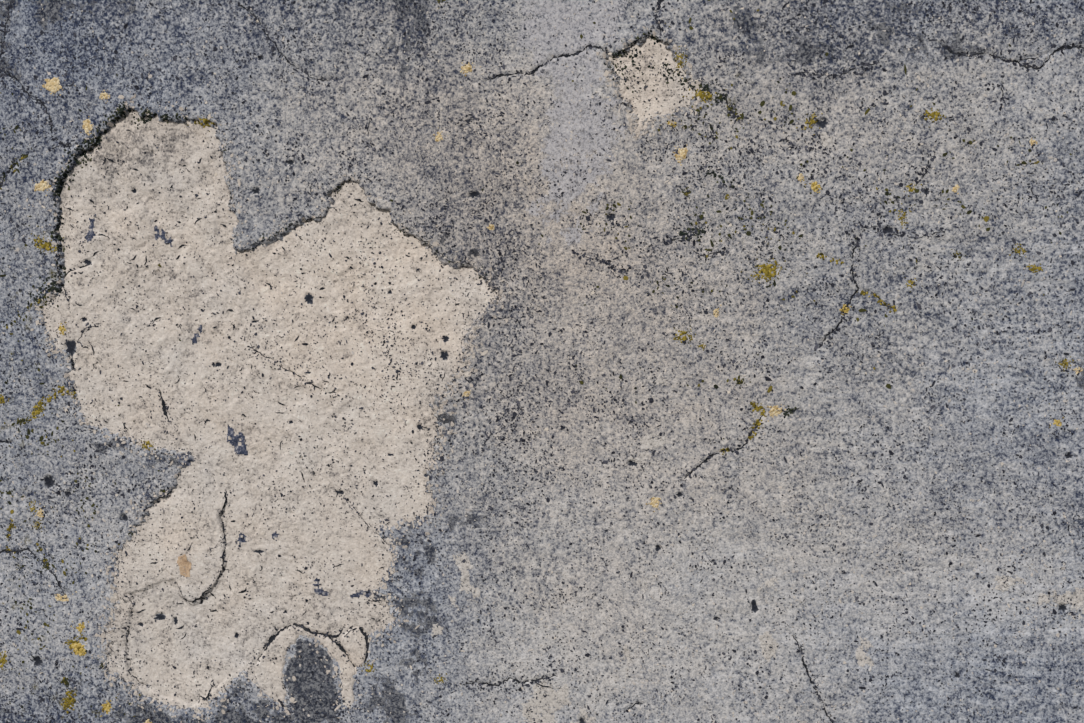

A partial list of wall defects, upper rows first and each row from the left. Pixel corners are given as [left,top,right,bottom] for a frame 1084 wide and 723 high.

crack [491,45,604,79]
spalling [596,21,710,153]
crack [822,226,939,342]
spalling [28,94,512,723]
crack [684,408,799,479]
crack [792,635,833,723]